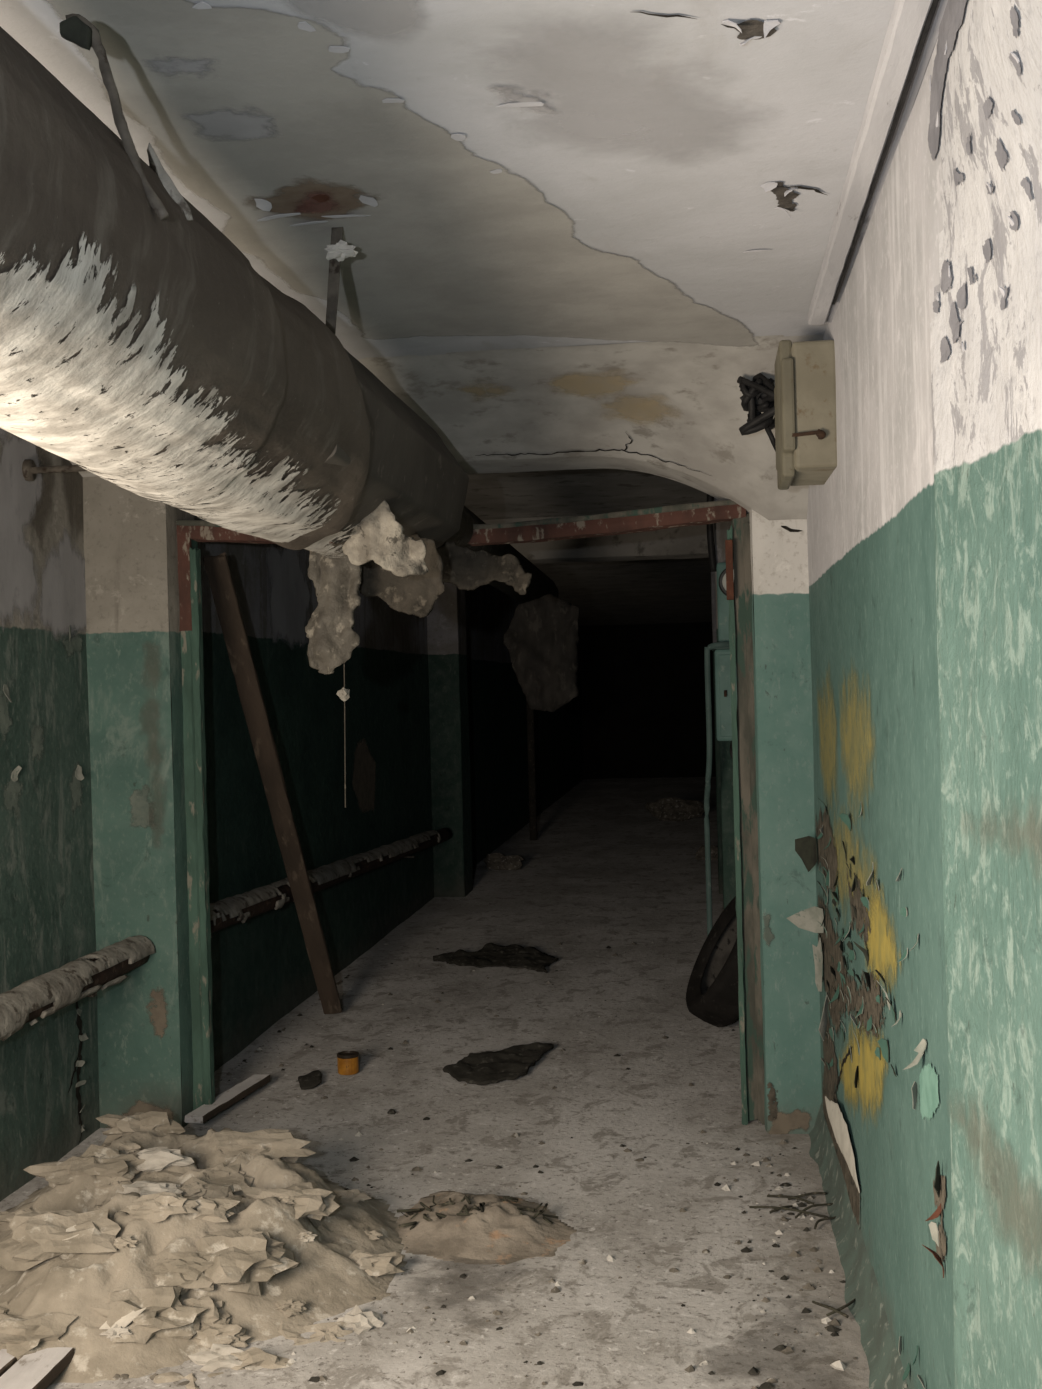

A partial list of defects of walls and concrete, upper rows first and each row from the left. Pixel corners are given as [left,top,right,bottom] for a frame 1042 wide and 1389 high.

spalling [721,20,780,46]
peeling [928,0,968,160]
peeling [1008,6,1021,76]
rust [250,179,378,226]
peeling [46,0,758,347]
spalling [761,182,826,218]
peeling [986,138,1009,195]
peeling [1020,178,1033,202]
peeling [933,239,991,363]
leakage [31,445,84,537]
peeling [767,798,939,1224]
spalling [923,1161,946,1278]